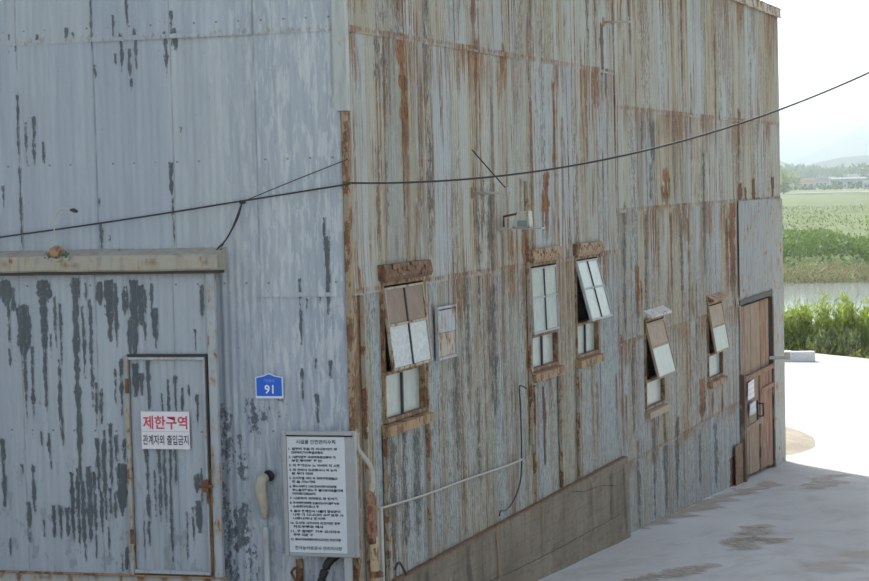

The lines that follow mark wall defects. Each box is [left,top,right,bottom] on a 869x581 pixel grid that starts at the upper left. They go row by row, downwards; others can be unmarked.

peeling [111,0,138,90]
peeling [163,10,178,74]
corrosion [397,33,408,129]
peeling [16,95,45,247]
corrosion [542,83,556,227]
corrosion [662,169,670,199]
corrosion [725,179,756,278]
peeling [0,277,199,562]
corrosion [616,336,627,421]
peeling [120,546,130,571]
peeling [185,468,204,559]
peeling [220,399,283,581]